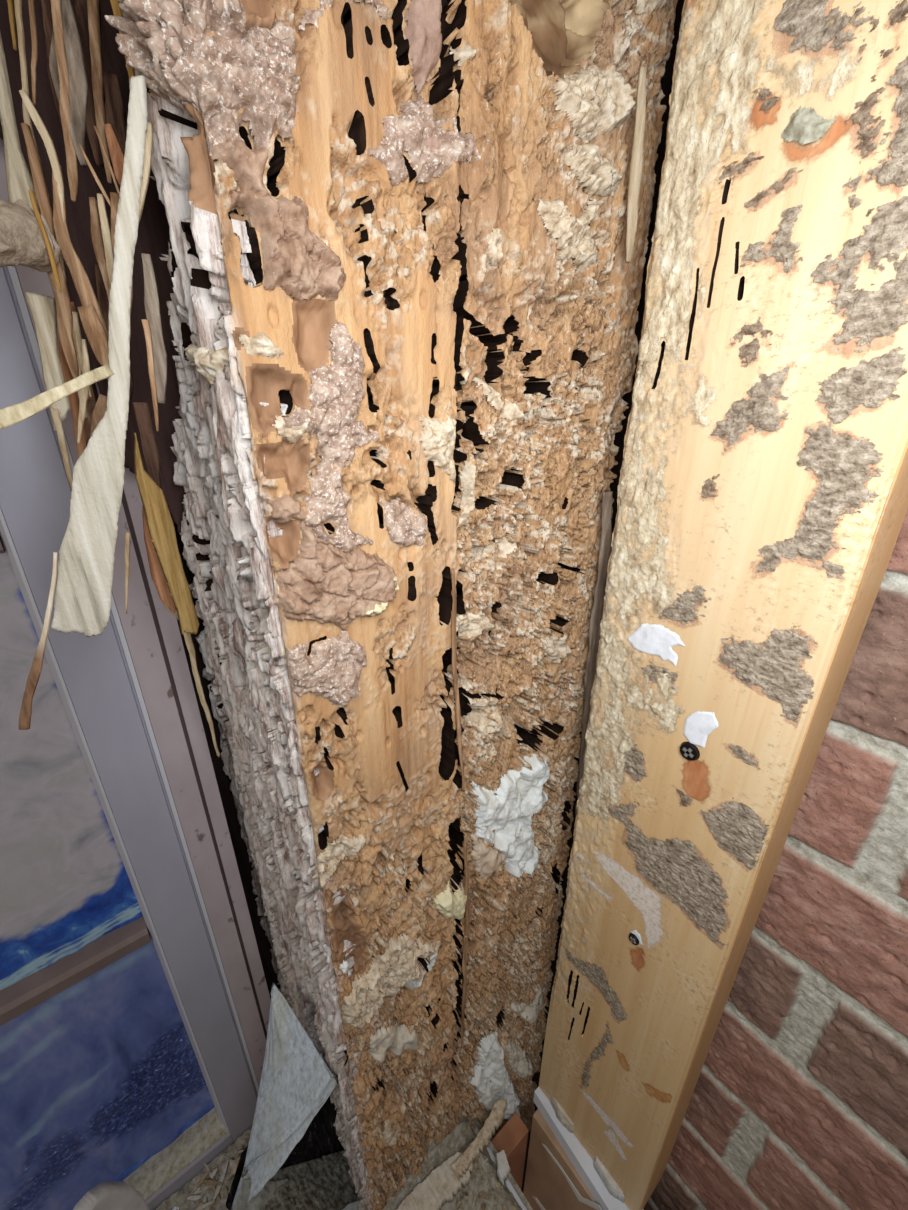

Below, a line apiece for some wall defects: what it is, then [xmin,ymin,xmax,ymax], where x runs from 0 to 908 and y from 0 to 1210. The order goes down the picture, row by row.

water stain [772,0,863,61]
water stain [846,72,907,165]
crack [651,179,745,389]
water stain [751,464,876,579]
rust [682,760,710,801]
crack [567,970,590,1040]